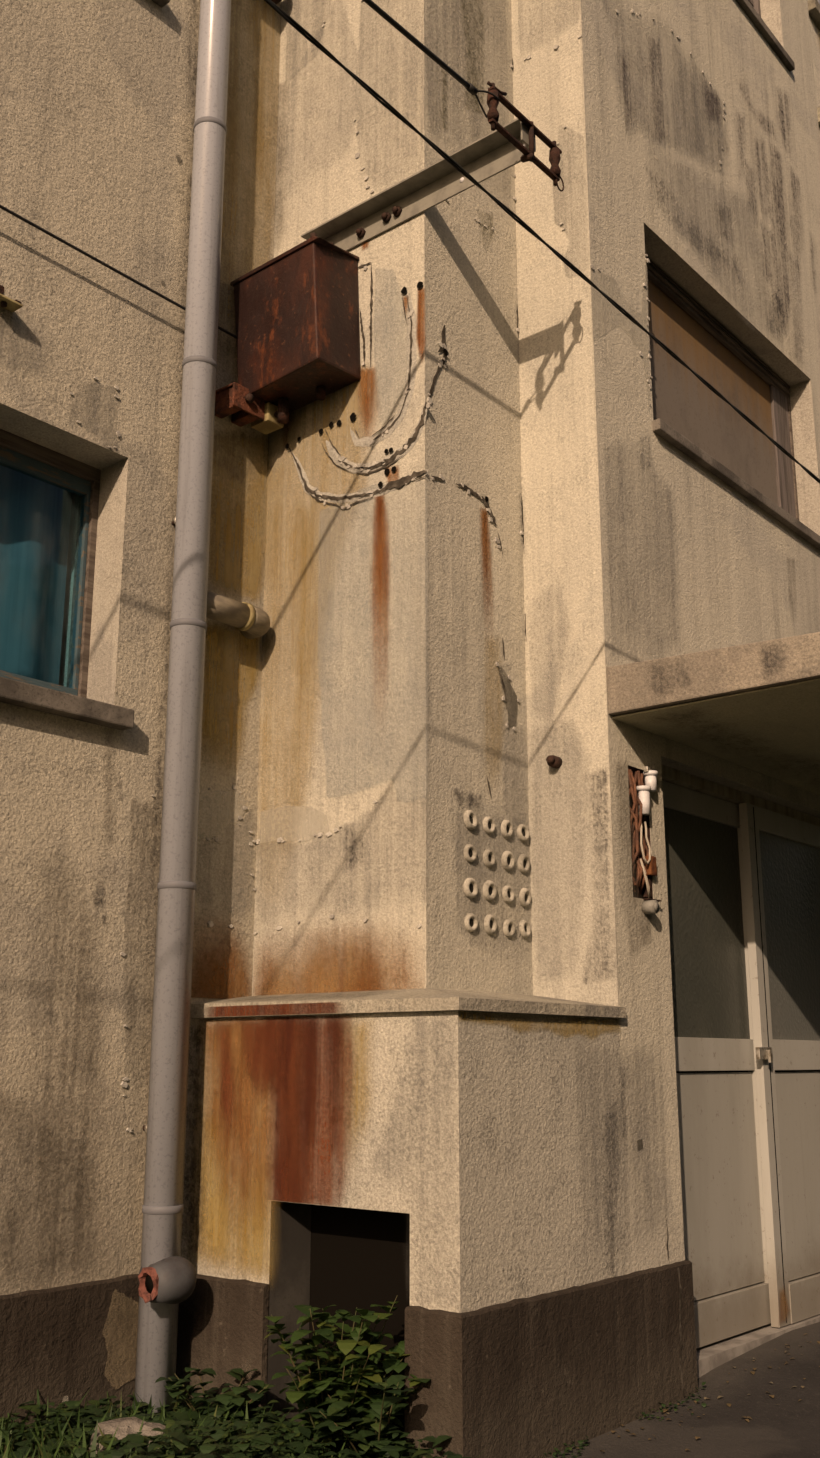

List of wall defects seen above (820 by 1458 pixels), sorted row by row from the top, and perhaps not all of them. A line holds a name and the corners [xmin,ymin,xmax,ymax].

damp [757,102,796,332]
rust [404,289,425,356]
crack [285,262,524,554]
rust [373,469,397,619]
rust [482,510,490,575]
flaking render [495,638,520,732]
rust [192,942,407,1205]